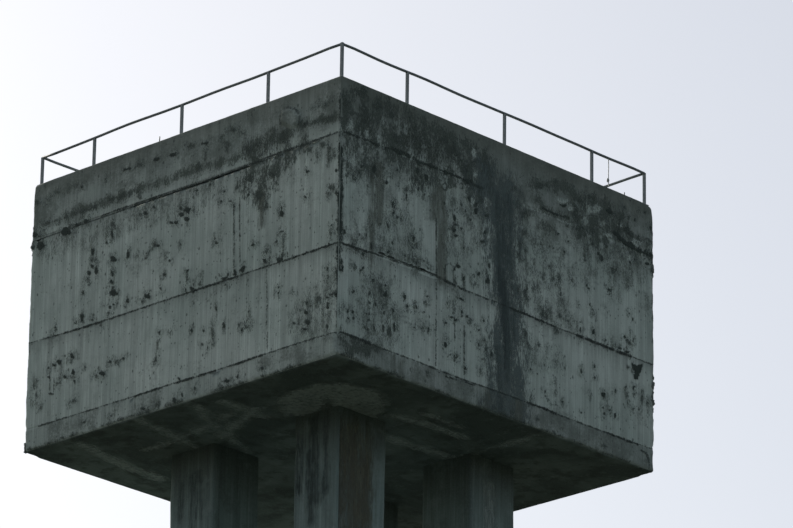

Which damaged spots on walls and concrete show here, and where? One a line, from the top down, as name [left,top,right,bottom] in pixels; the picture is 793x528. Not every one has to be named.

damp [32,84,653,426]
spalling [577,303,651,418]